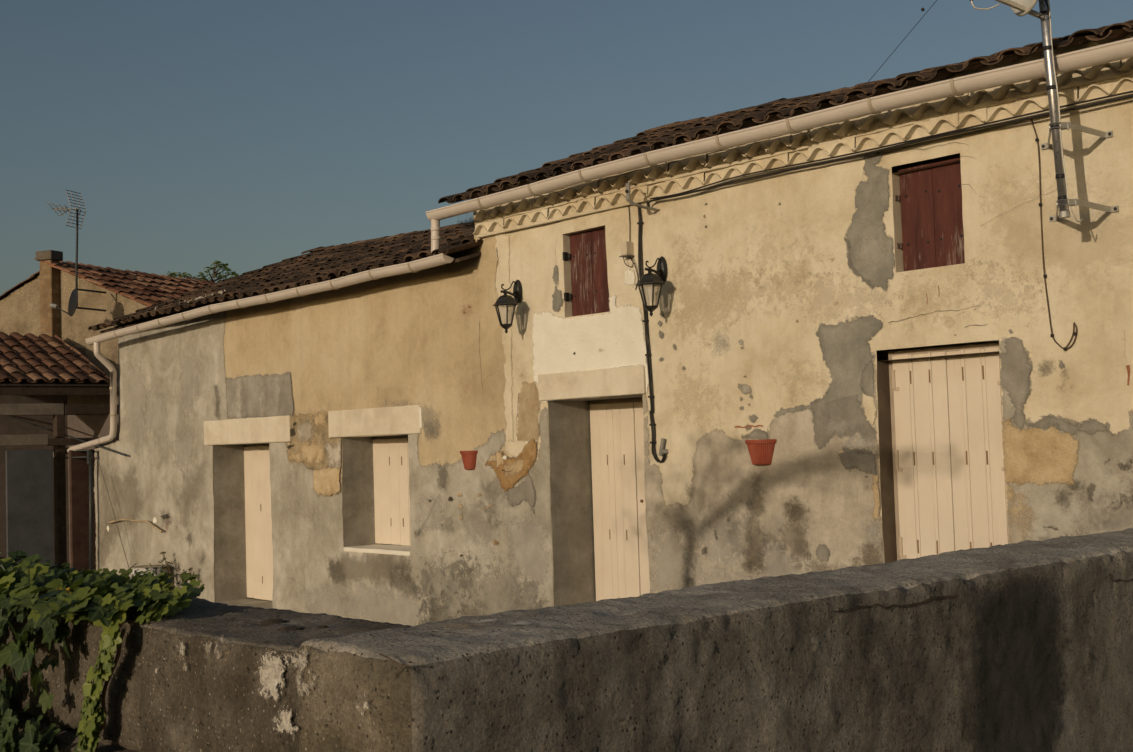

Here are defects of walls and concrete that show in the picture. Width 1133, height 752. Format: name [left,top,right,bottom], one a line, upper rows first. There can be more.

peeling [485,233,540,492]
spalling [287,411,342,496]
leakage [838,448,877,475]
peeling [862,392,877,430]
flaking render [1001,419,1079,544]
leakage [690,507,798,577]